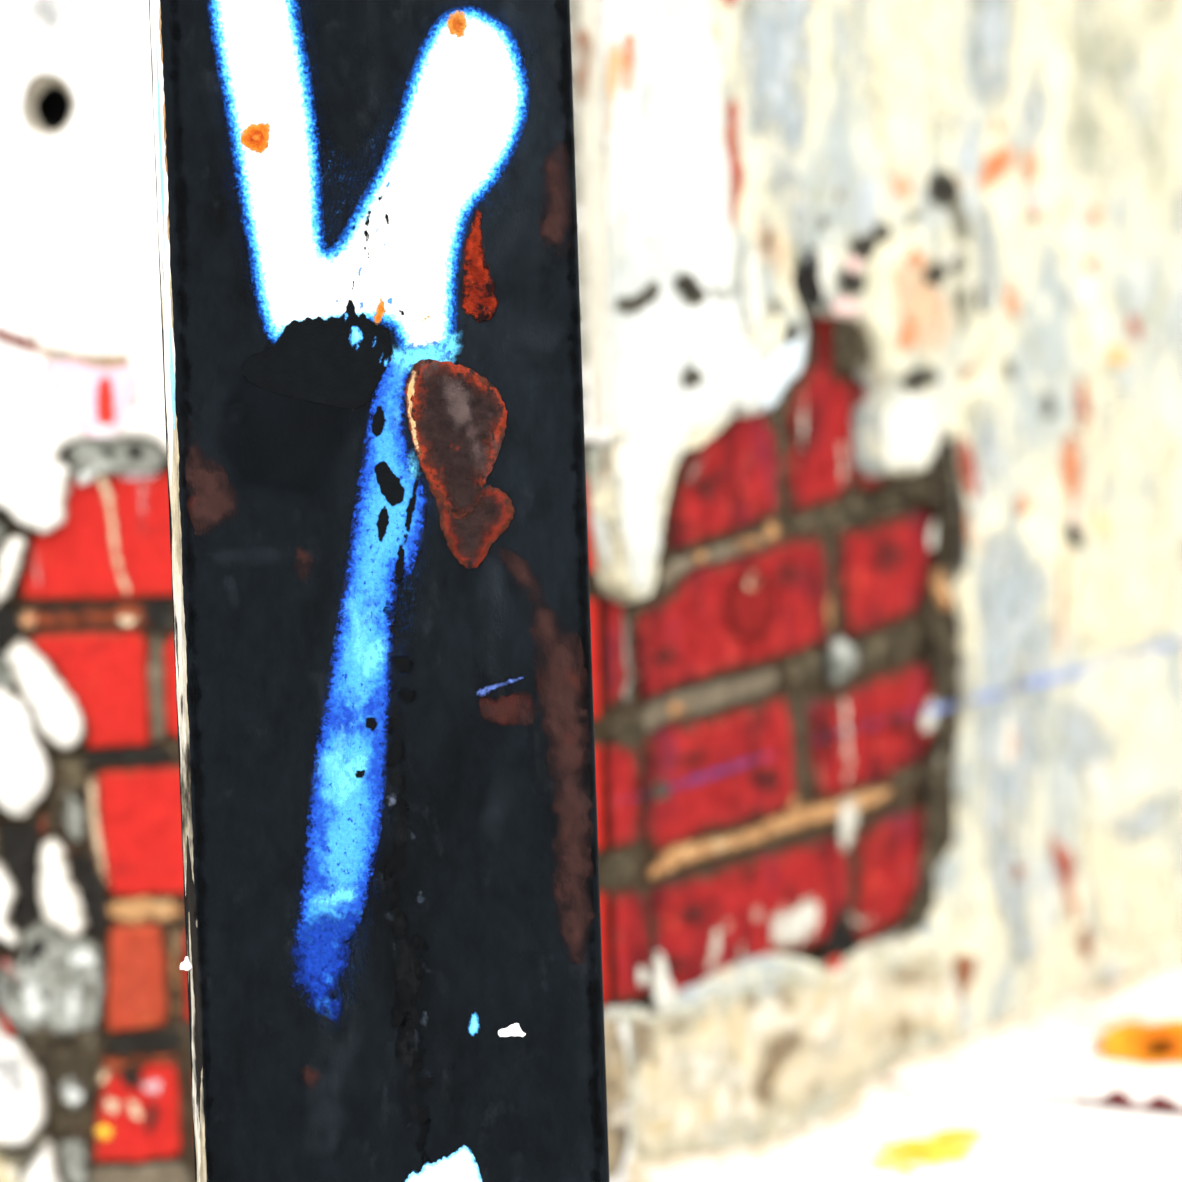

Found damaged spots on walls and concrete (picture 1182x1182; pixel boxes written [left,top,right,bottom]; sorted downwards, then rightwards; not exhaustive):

spalling [0,358,195,1182]
corrosion [461,210,498,322]
corrosion [404,359,595,964]
spalling [585,0,962,1015]